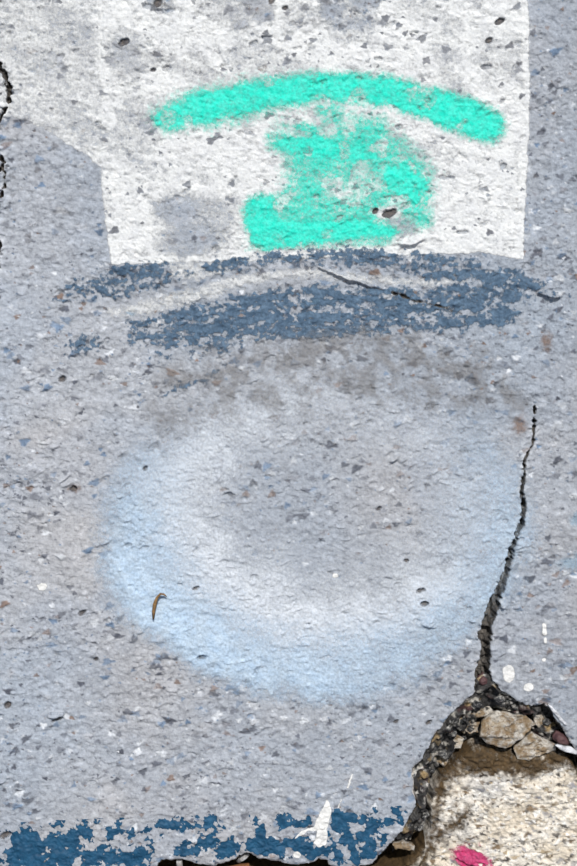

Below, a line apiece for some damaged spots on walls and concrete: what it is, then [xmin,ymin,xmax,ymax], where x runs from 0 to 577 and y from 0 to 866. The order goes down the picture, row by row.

crack [0,155,8,198]
crack [0,62,13,122]
crack [474,405,536,689]
peeling [0,671,577,866]